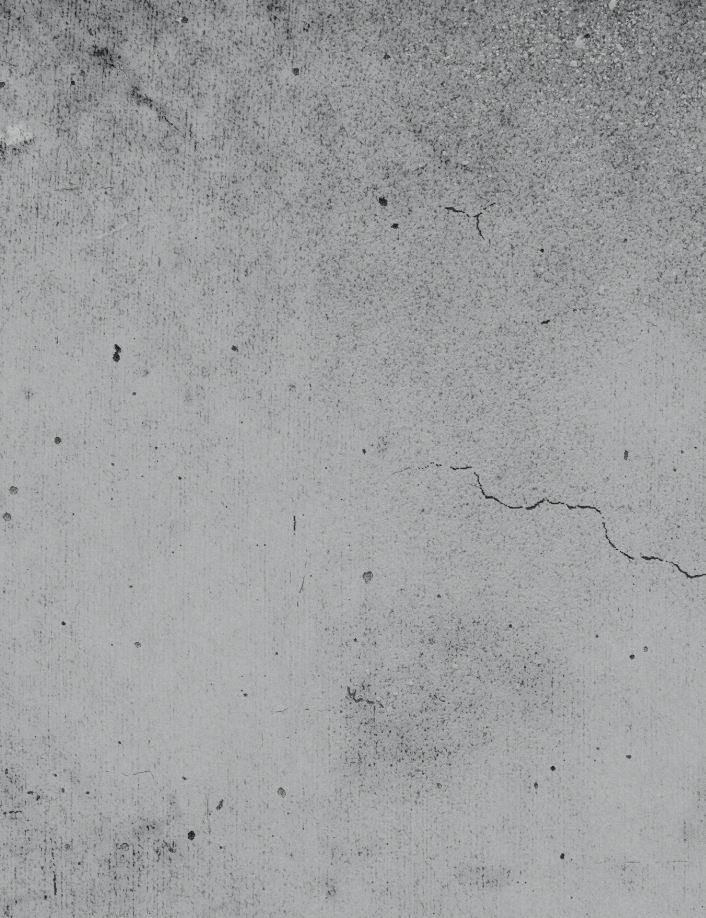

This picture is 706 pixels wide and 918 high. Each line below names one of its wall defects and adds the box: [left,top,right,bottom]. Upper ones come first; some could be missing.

crack [446,189,520,247]
crack [393,465,705,578]